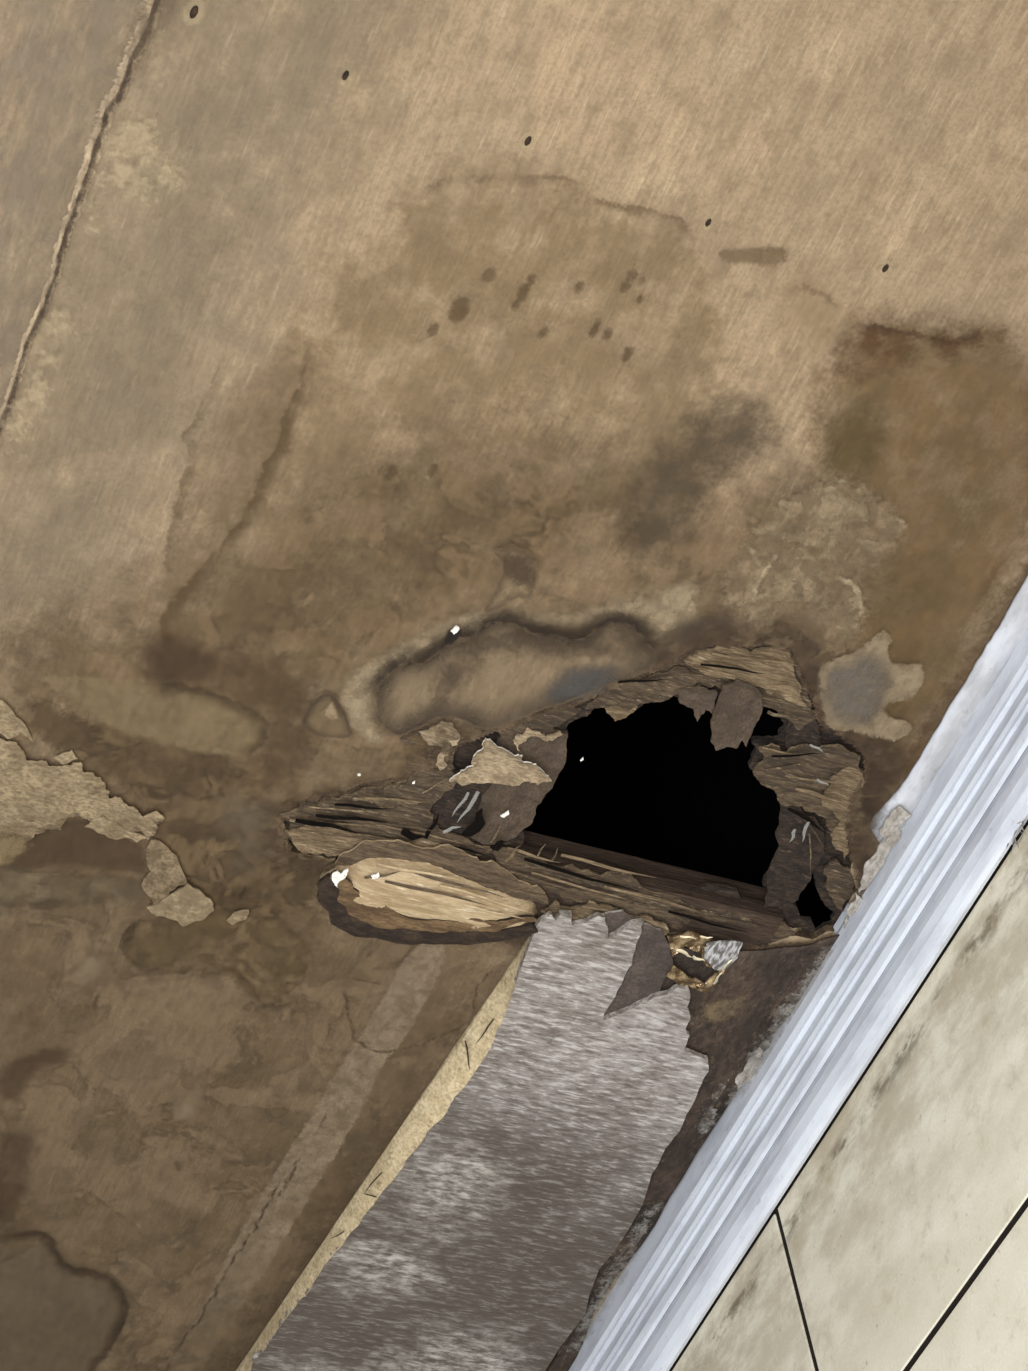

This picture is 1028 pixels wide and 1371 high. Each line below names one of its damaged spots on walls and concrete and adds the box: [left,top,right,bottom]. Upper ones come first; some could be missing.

crack [0,0,164,435]
water stain [429,298,468,335]
water stain [719,249,786,264]
spalling [302,544,696,786]
peeling [0,699,249,927]
peeling [332,869,348,887]
water stain [0,324,1028,1371]
spalling [236,935,530,1371]